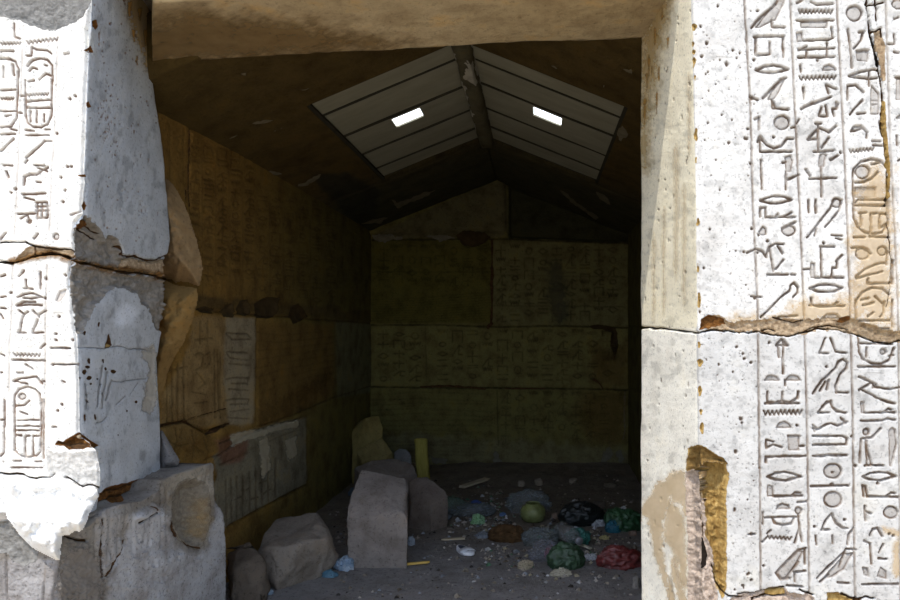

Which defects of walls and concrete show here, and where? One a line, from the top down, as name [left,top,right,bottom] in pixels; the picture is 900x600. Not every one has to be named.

crack [864,0,891,306]
crack [0,226,165,280]
spalling [17,201,166,335]
crack [644,317,900,343]
spalling [697,293,900,344]
peeling [126,345,158,414]
spalling [0,520,39,566]
spalling [685,445,814,600]
spalling [827,592,874,600]